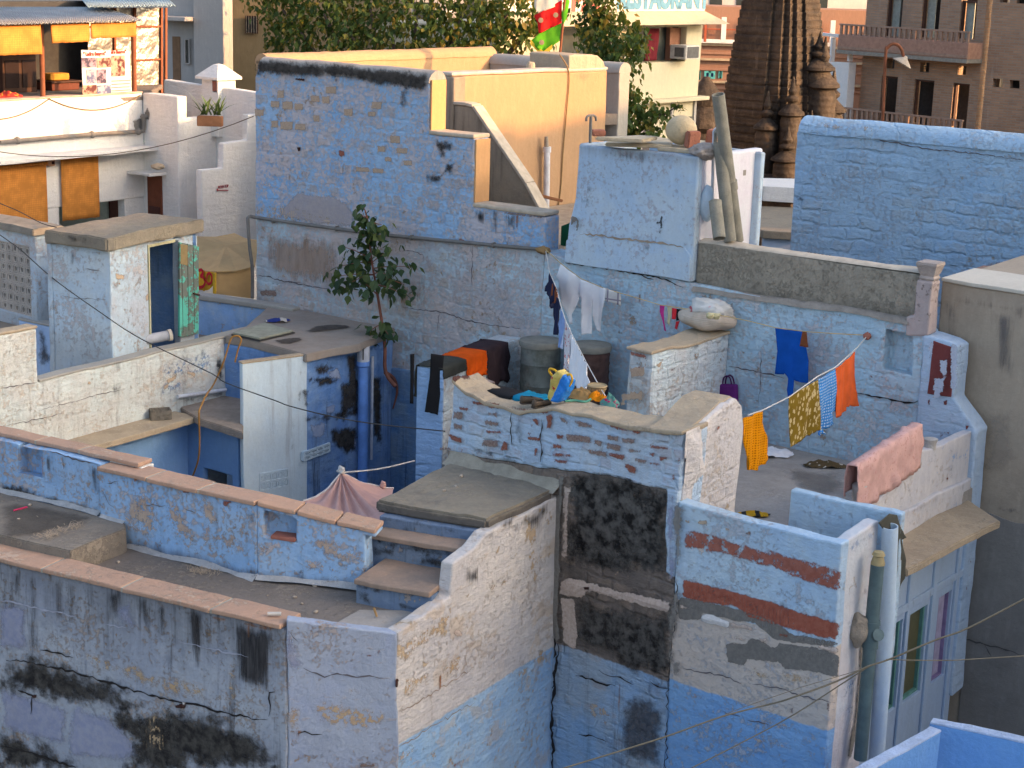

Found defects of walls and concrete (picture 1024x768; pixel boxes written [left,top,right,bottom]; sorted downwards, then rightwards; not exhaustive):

flaking render [255,86,336,130]
damp [256,60,427,105]
flaking render [356,136,412,173]
damp [304,356,358,453]
flaking render [440,401,675,473]
peeling [928,343,958,405]
damp [567,474,668,572]
damp [0,656,277,768]
crack [6,650,273,720]
damp [237,626,269,687]
crack [550,639,835,768]
flaking render [677,598,839,676]